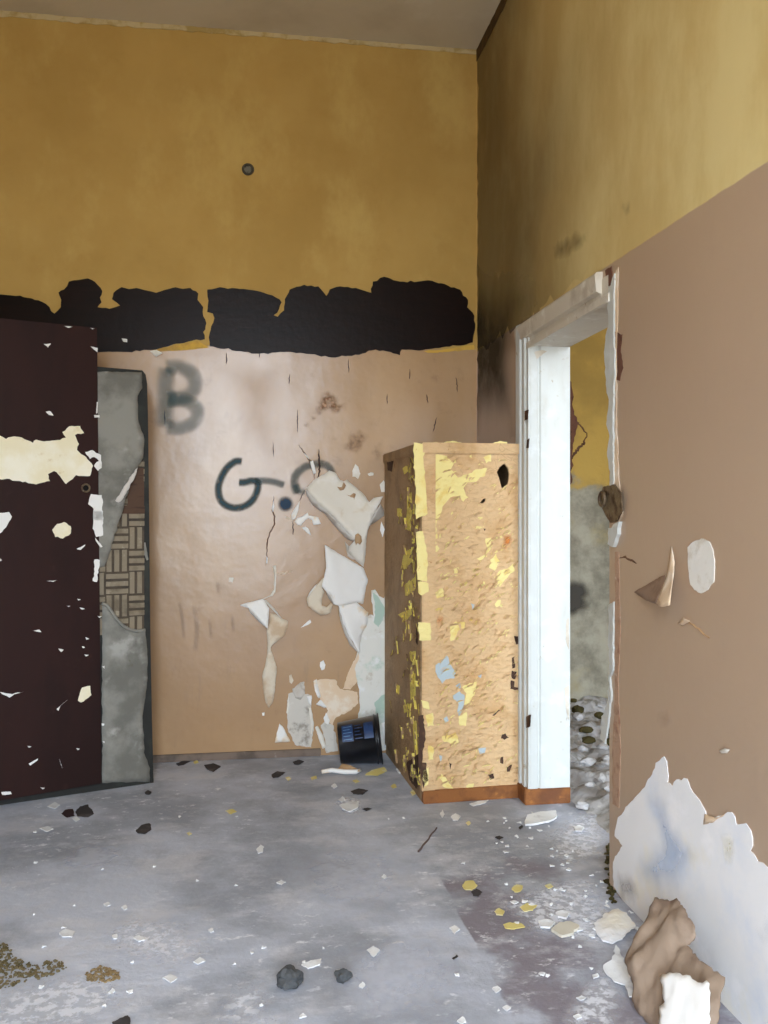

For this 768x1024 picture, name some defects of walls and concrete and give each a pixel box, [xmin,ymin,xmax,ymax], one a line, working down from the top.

peeling [0,426,102,484]
crack [299,445,321,479]
peeling [352,464,385,492]
peeling [286,490,321,535]
crack [263,496,293,599]
water stain [570,583,586,613]
flaking render [275,590,386,753]
flaking render [612,538,768,1024]